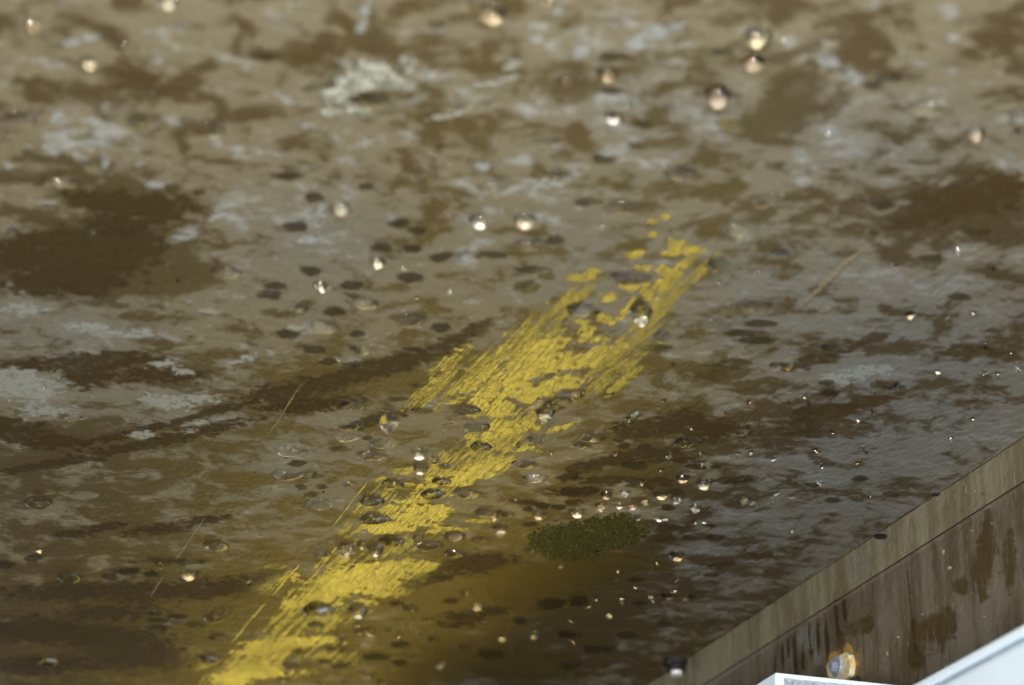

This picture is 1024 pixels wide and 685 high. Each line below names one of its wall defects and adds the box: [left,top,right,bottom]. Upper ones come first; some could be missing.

leakage [0,181,723,685]
spalling [531,390,589,411]
leakage [518,404,764,541]
leakage [955,509,1016,602]
leakage [774,599,873,673]
leakage [908,608,957,668]